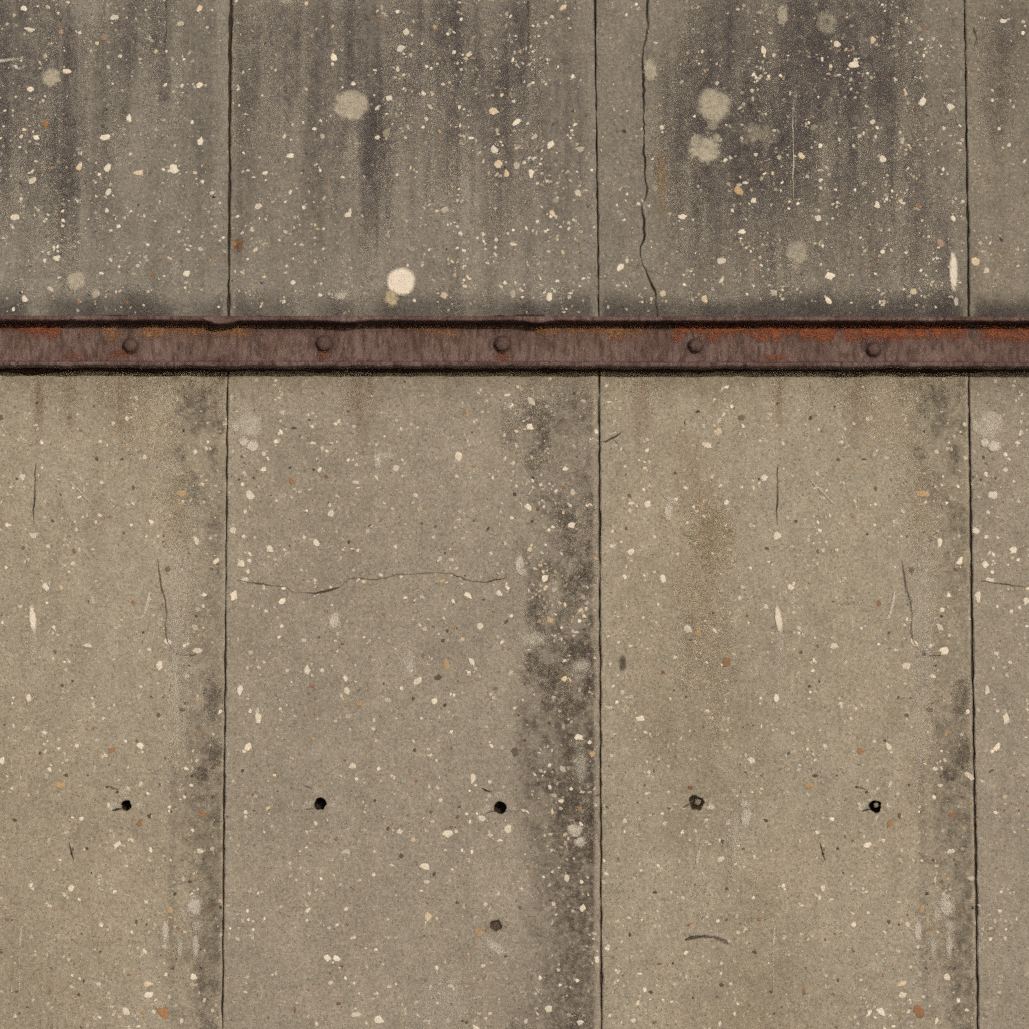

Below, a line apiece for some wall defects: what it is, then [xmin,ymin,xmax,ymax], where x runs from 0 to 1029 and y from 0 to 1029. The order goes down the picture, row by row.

damp [816,3,862,127]
damp [785,38,803,198]
crack [640,0,658,316]
damp [702,300,961,317]
rust [142,325,247,338]
rust [673,325,965,341]
rust [982,326,1029,341]
rust [0,351,1029,376]
damp [515,555,526,576]
damp [523,615,594,1029]